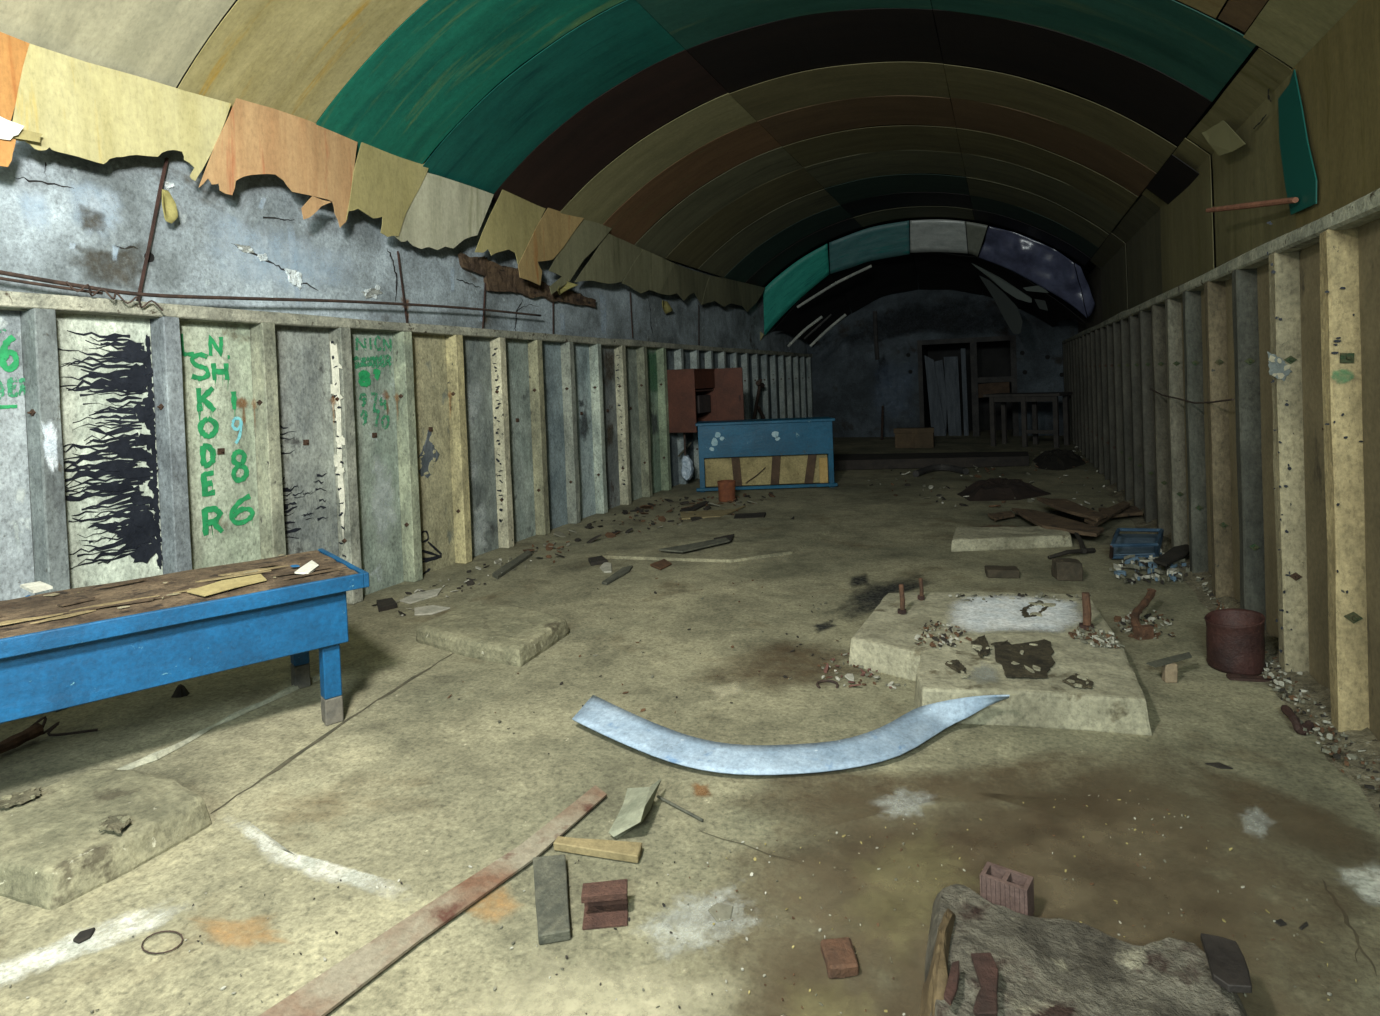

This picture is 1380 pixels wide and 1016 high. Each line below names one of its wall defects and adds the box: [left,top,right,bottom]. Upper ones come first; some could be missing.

corrosion [136,157,169,301]